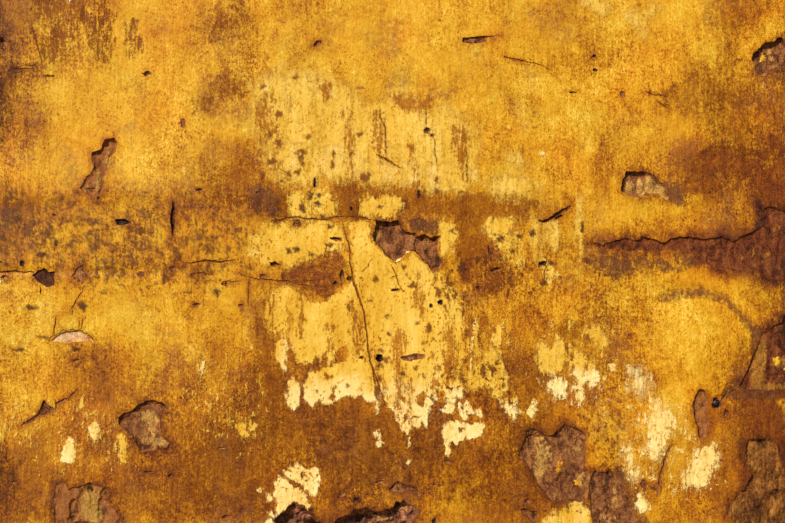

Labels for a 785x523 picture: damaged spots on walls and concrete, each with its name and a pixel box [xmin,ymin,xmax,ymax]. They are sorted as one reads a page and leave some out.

spalling [749,34,785,79]
spalling [77,134,121,205]
crack [0,267,44,299]
crack [45,282,98,352]
crack [181,179,388,409]
peeling [244,64,785,523]
corrosion [582,251,698,280]
peeling [182,345,269,458]
spalling [0,385,177,523]